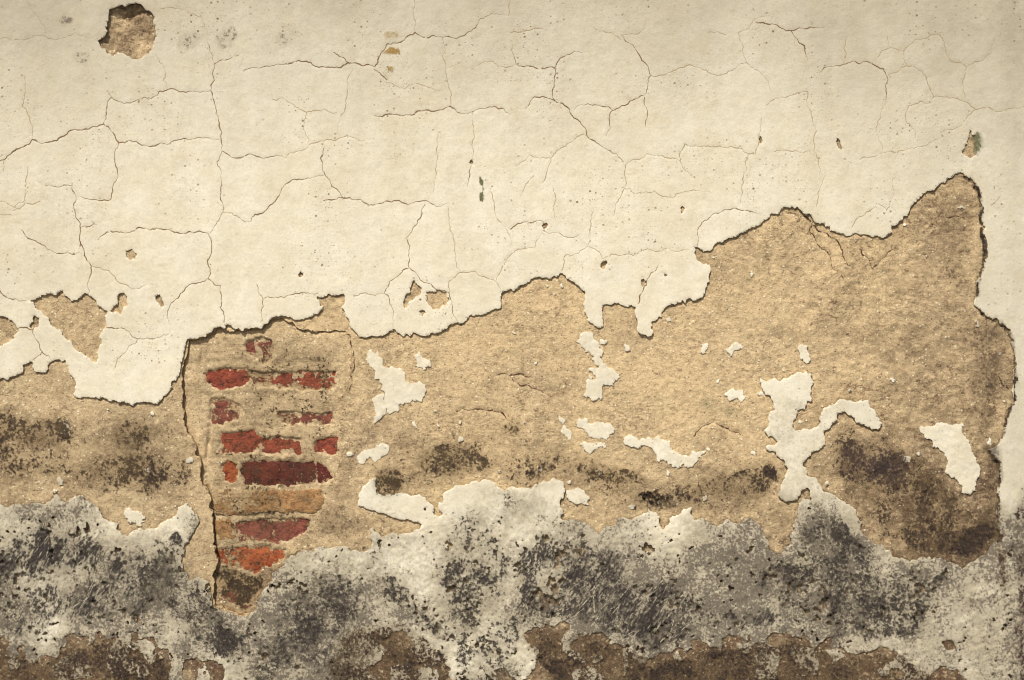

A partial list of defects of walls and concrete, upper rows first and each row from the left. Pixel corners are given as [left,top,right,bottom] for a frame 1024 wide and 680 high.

flaking render [99,3,157,59]
flaking render [962,131,976,158]
crack [0,0,1023,370]
flaking render [0,172,1016,617]
damp [0,310,1024,680]
flaking render [492,621,905,680]
flaking render [926,666,967,680]
flaking render [942,640,956,650]